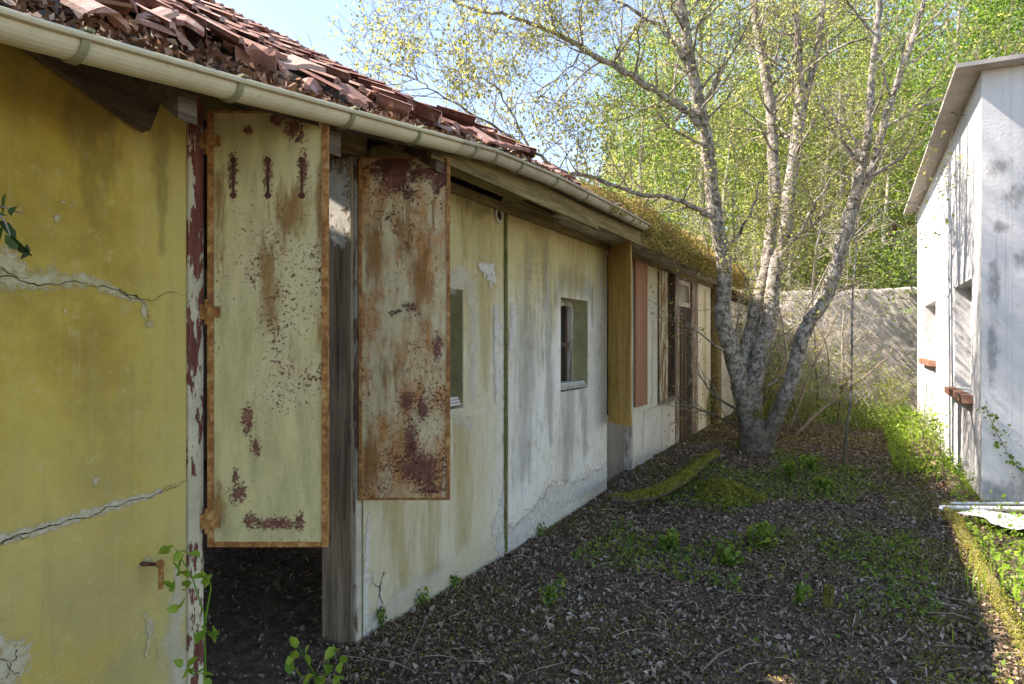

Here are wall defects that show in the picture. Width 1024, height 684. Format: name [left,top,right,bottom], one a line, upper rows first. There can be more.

corrosion [216,143,240,220]
corrosion [243,114,321,238]
corrosion [366,168,445,202]
crack [0,244,180,328]
corrosion [262,245,274,317]
corrosion [365,231,382,279]
peeling [478,258,497,289]
corrosion [432,328,444,366]
corrosion [240,393,263,457]
corrosion [383,367,445,493]
crack [0,479,187,545]
corrosion [215,467,307,532]